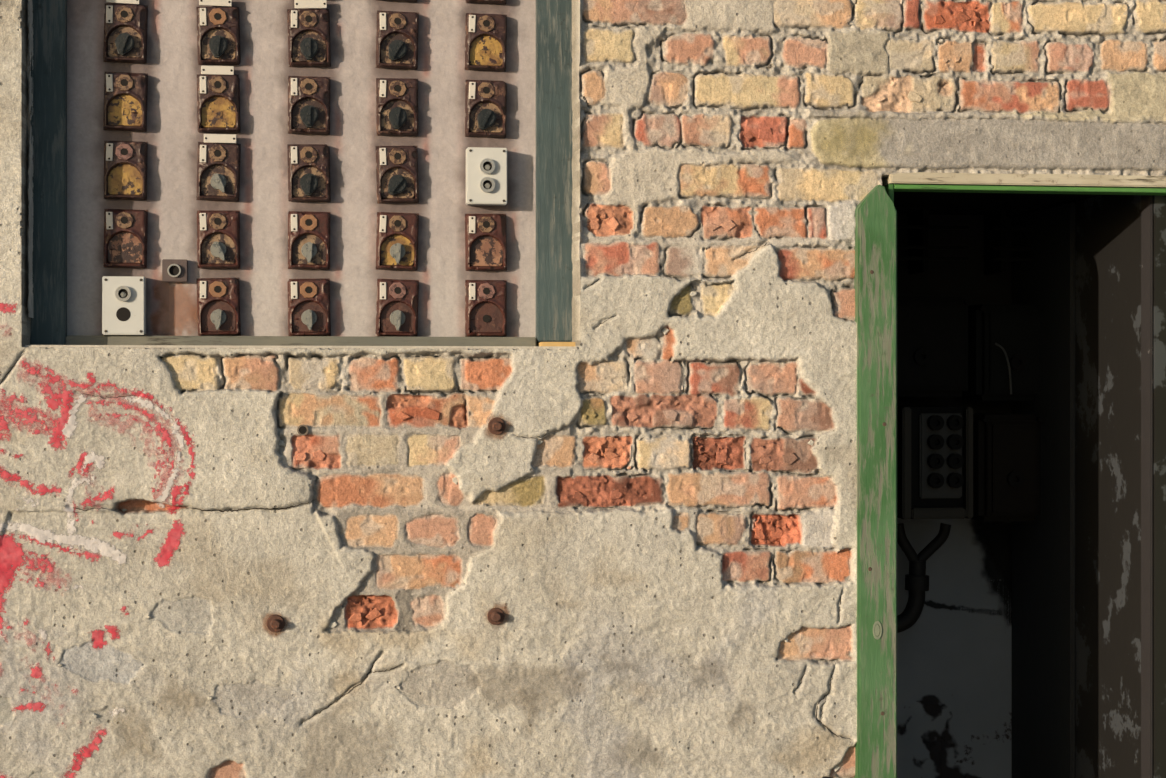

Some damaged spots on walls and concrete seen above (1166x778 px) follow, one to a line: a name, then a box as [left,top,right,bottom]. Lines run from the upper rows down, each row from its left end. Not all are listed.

spalling [862,0,990,113]
spalling [740,117,790,149]
spalling [585,204,635,237]
spalling [701,206,754,240]
peeling [161,280,855,634]
crack [186,501,312,512]
peeling [776,625,855,665]
crack [302,660,400,723]
peeling [209,761,246,778]